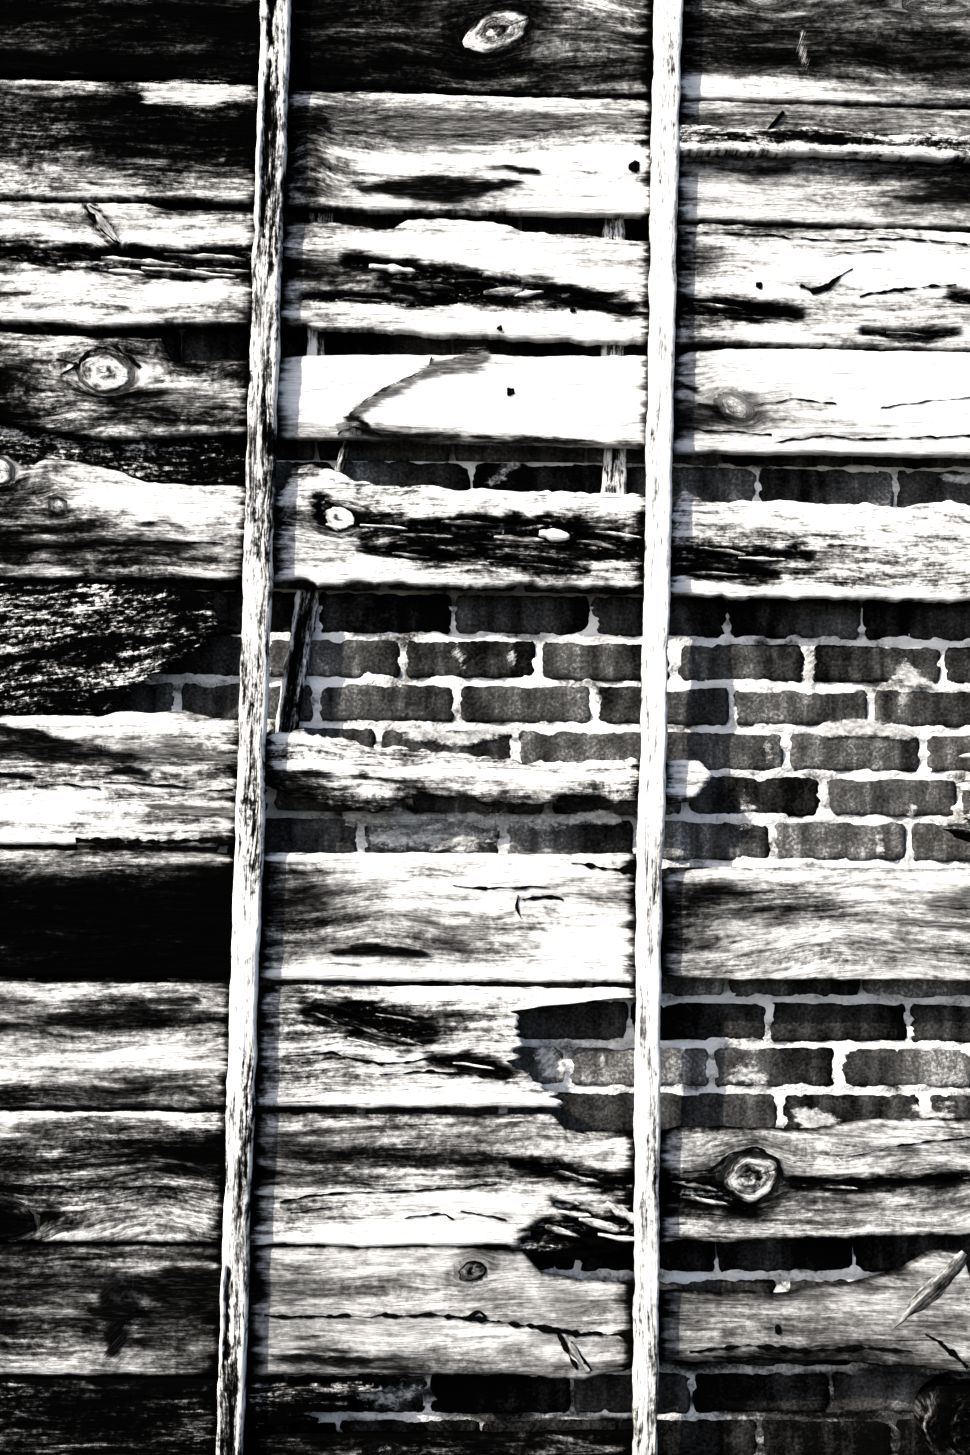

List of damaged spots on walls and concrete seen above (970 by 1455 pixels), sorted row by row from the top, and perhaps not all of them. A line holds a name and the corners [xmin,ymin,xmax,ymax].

crack [264,1310,633,1371]